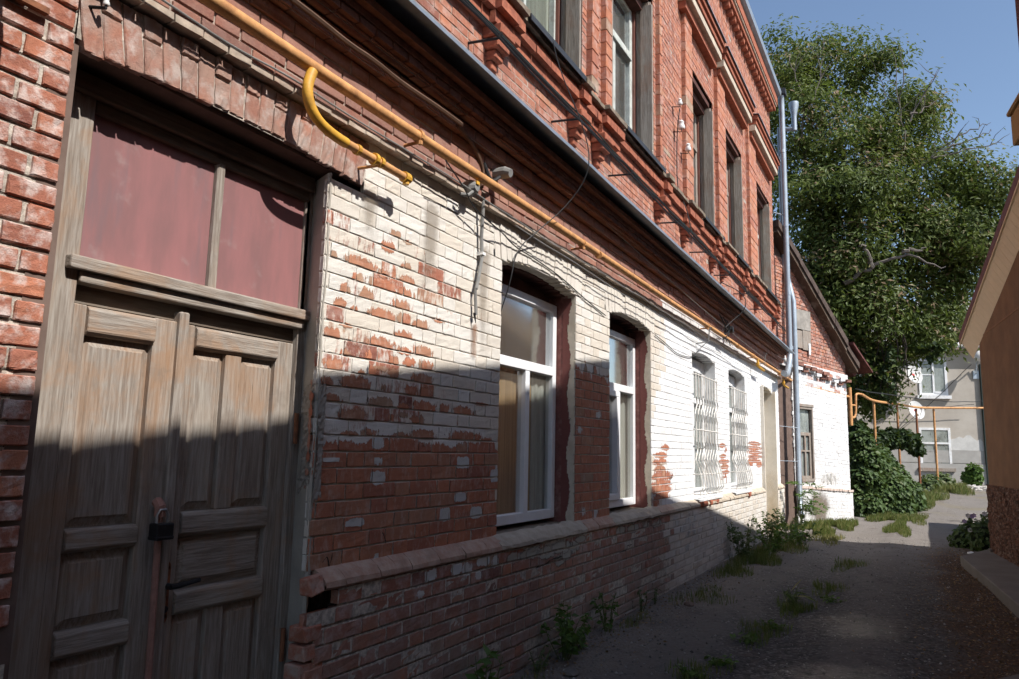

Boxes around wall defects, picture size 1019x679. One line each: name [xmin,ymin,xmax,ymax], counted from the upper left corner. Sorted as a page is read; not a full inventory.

peeling [381,229,412,253]
peeling [297,249,498,613]
peeling [574,361,610,521]
peeling [651,444,673,507]
peeling [747,441,762,467]
spalling [283,623,322,679]